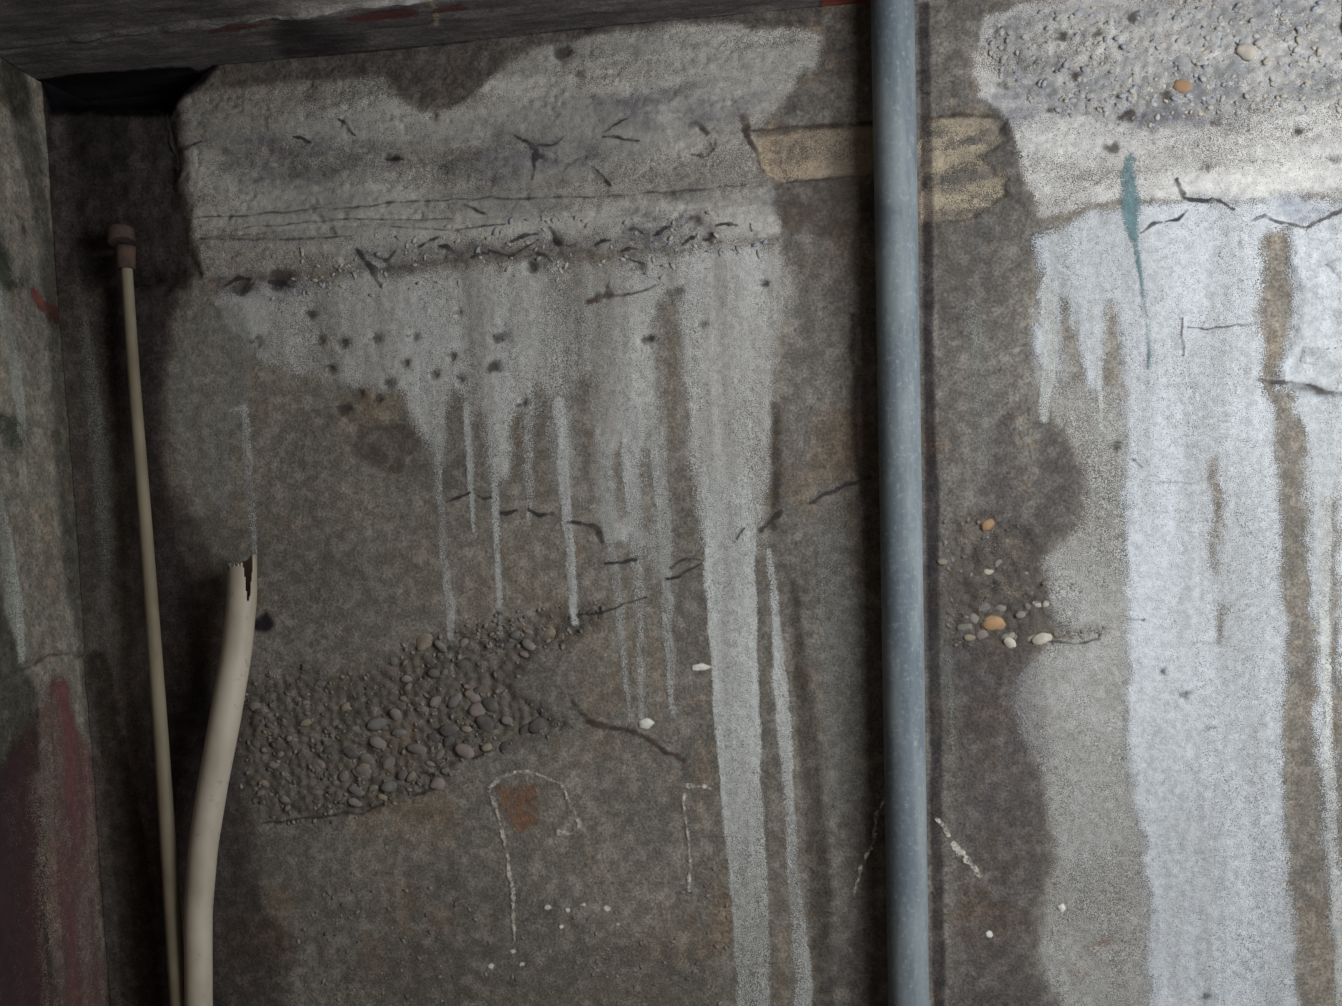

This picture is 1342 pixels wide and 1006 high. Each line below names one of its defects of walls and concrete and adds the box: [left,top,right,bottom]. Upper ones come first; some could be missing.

crack [515,134,564,181]
crack [595,118,640,186]
crack [1146,177,1342,230]
crack [225,275,292,287]
crack [356,227,562,284]
crack [595,222,738,265]
damp [1005,153,1342,1006]
damp [163,227,815,1006]
damp [811,476,866,813]